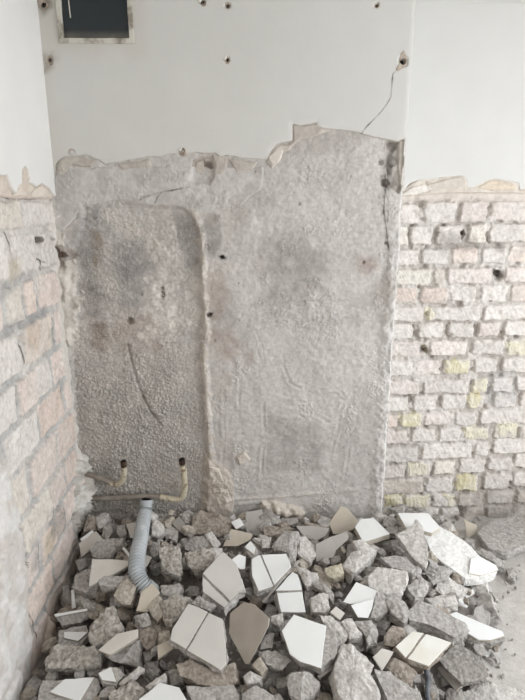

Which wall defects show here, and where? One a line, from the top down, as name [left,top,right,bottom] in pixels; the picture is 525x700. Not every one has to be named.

flaking render [0,124,330,231]
flaking render [384,140,525,196]
spalling [443,358,470,374]
spalling [466,377,488,409]
spalling [442,473,477,506]
flaking render [201,454,264,570]
spalling [384,493,440,536]